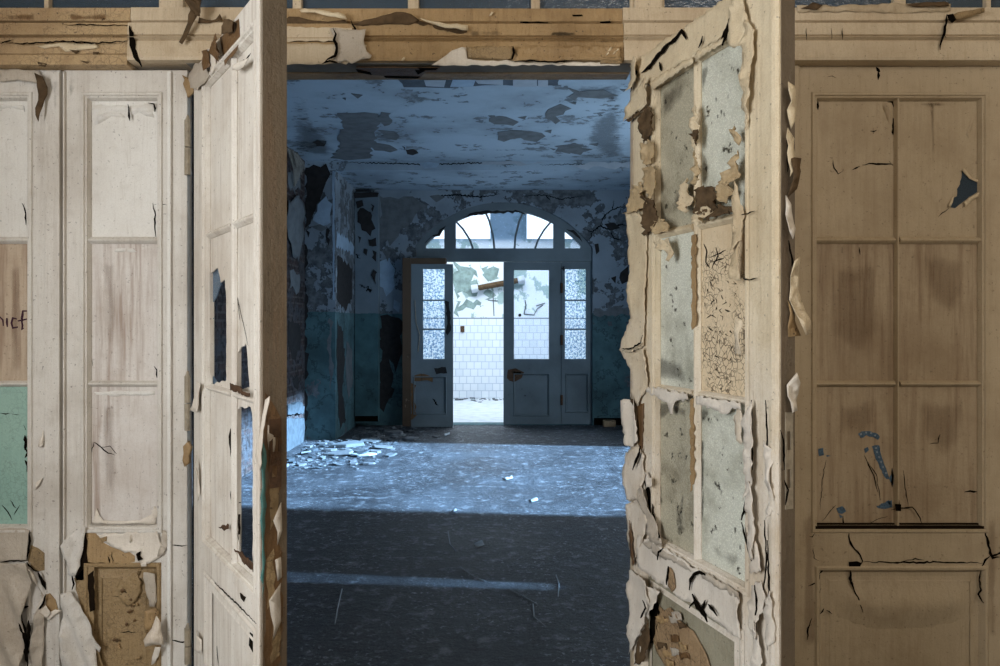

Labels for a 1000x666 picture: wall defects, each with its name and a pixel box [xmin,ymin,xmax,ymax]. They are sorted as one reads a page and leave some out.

peeling [179,0,240,75]
peeling [432,0,755,142]
crack [939,15,948,49]
crack [833,161,893,174]
flaking render [287,112,444,432]
peeling [453,262,499,317]
crack [704,245,756,390]
peeling [728,179,746,281]
peeling [605,212,776,666]
peeling [0,526,167,666]
crack [807,535,832,639]
crack [842,519,1000,612]